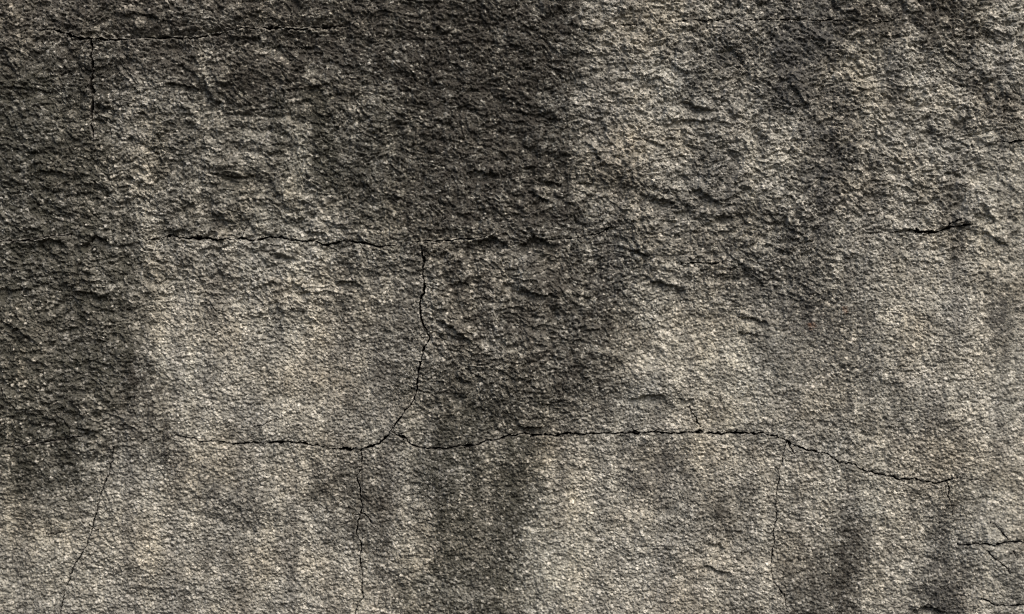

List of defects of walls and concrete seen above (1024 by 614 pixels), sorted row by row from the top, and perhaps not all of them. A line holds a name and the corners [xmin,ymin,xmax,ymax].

crack [26,12,369,141]
crack [140,220,990,614]
crack [0,433,116,614]